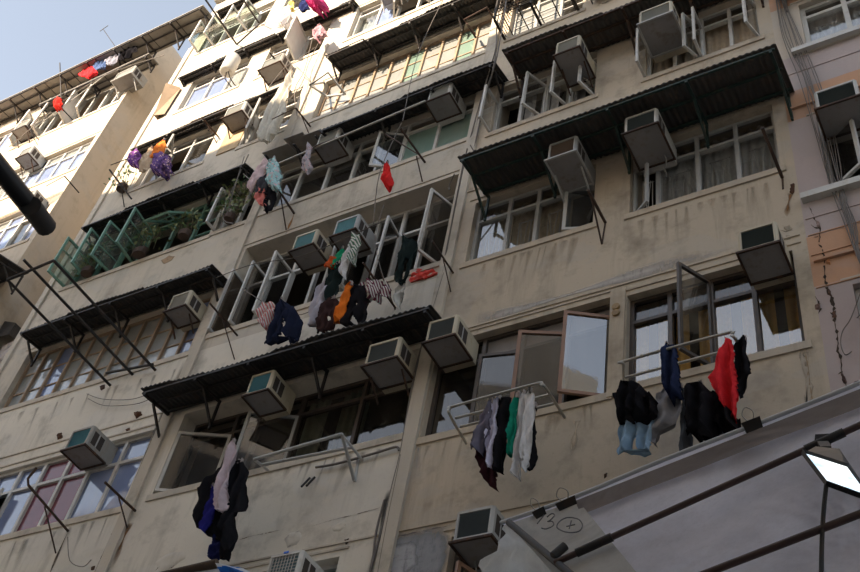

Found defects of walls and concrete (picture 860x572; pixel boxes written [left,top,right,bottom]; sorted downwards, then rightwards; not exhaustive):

crack [809,207,857,386]